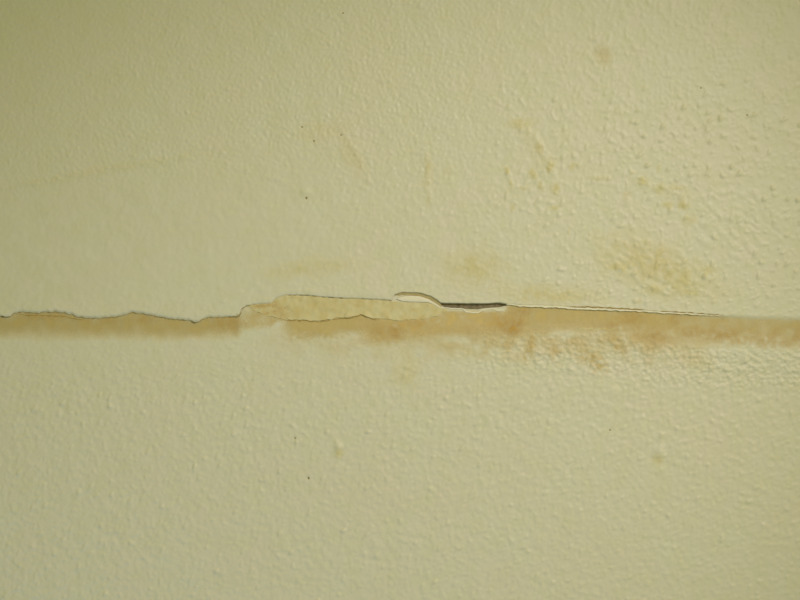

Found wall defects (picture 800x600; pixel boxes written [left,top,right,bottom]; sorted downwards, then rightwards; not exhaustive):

crack [0,304,254,324]
crack [287,292,506,322]
water stain [366,312,516,342]
spalling [247,295,800,337]
crack [572,306,722,316]